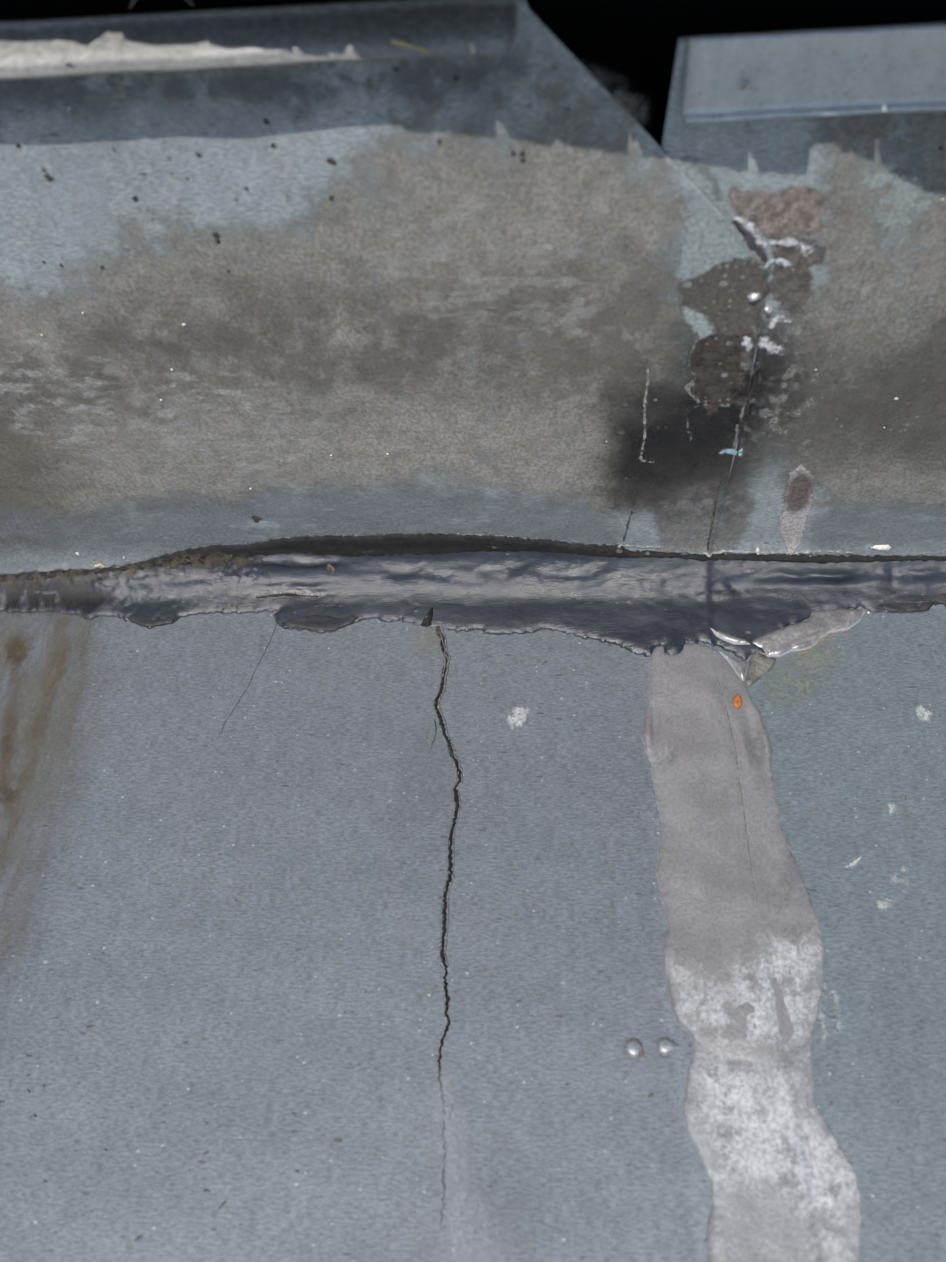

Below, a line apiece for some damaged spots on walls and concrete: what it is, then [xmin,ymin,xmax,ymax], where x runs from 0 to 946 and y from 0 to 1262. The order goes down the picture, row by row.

damp [0,85,946,546]
crack [427,626,463,1226]